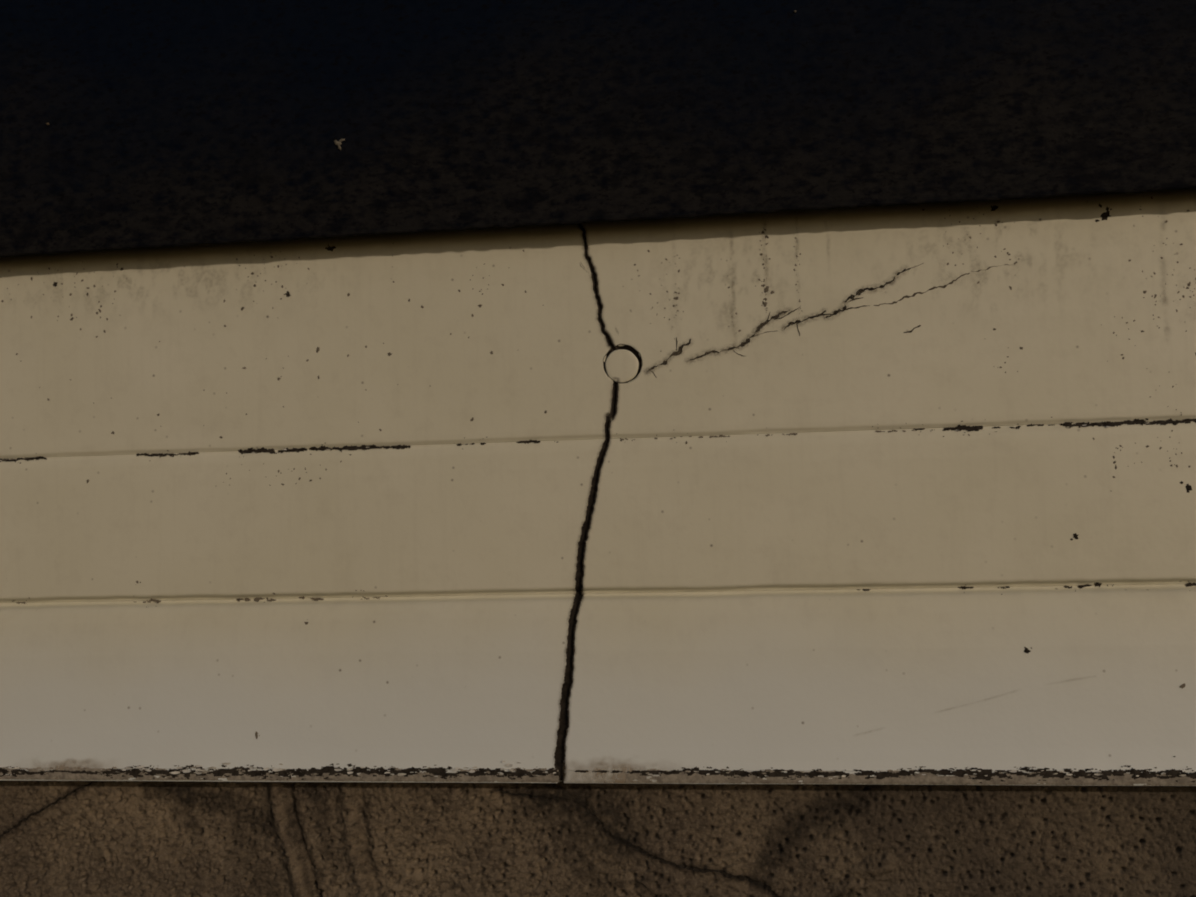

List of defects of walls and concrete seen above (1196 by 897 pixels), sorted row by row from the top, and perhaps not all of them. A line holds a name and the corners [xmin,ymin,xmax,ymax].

crack [497,224,1008,897]
peeling [0,761,559,783]
peeling [575,756,1196,786]